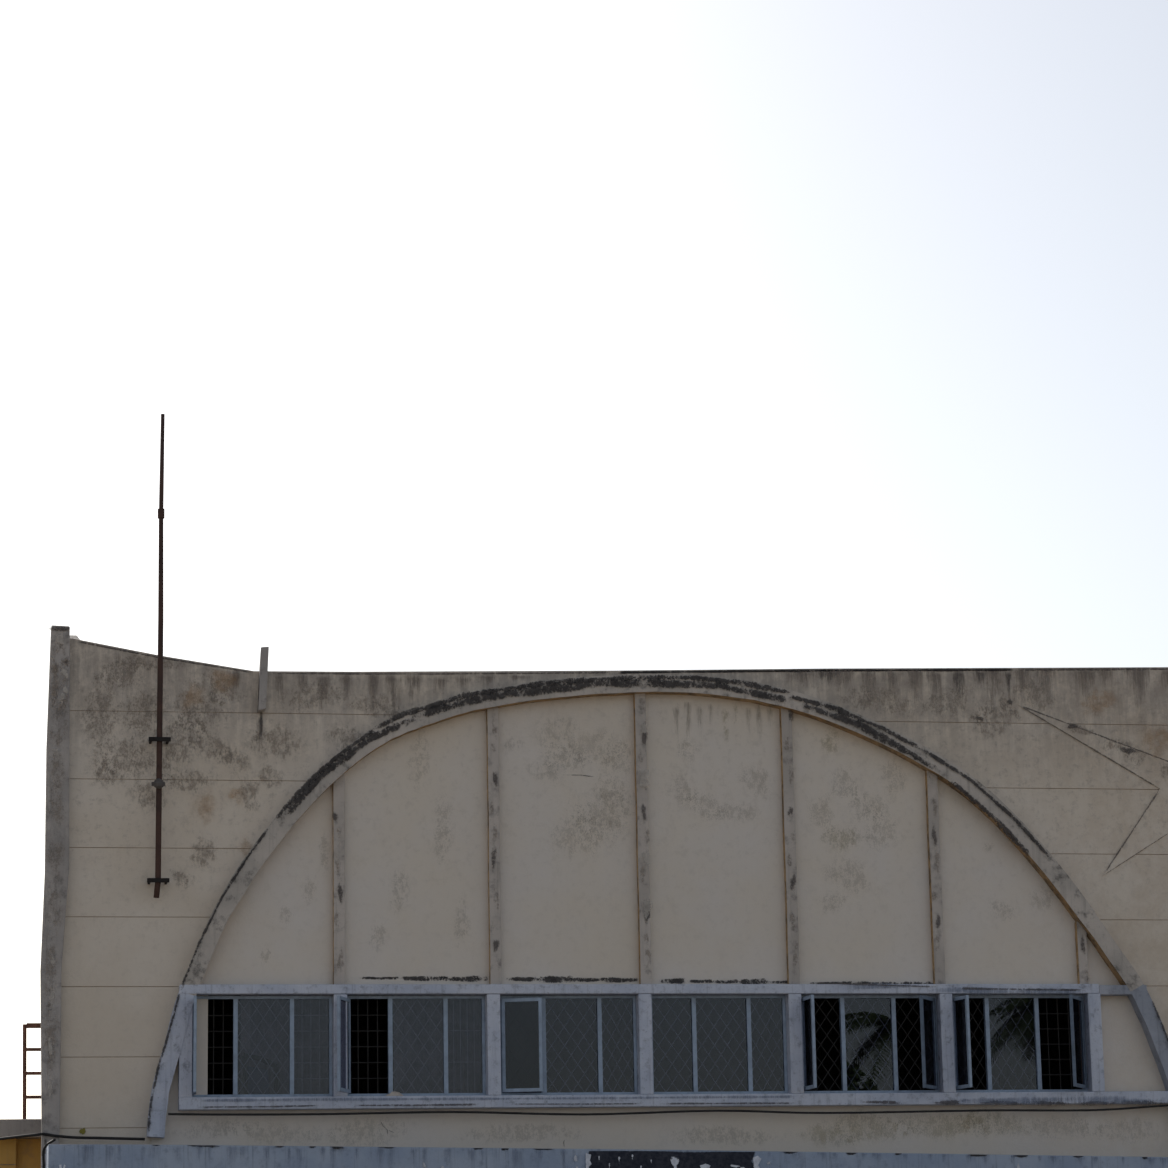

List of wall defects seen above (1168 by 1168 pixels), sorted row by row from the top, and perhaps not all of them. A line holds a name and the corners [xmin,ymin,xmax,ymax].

damp [81,642,247,683]
damp [276,668,1168,857]
damp [147,829,268,1131]